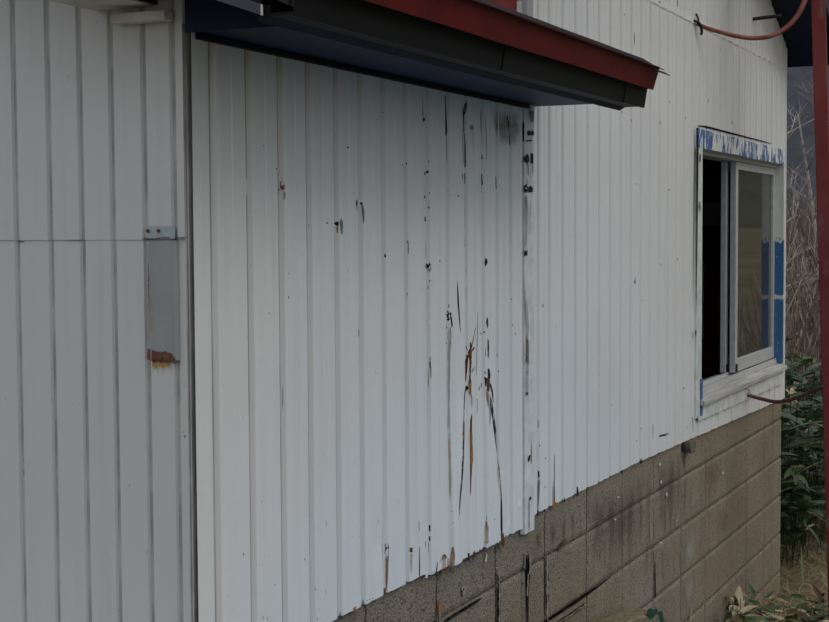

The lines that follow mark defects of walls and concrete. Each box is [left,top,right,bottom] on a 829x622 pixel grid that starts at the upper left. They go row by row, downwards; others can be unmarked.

corrosion [147,349,175,368]
corrosion [466,515,489,560]
corrosion [436,547,455,573]